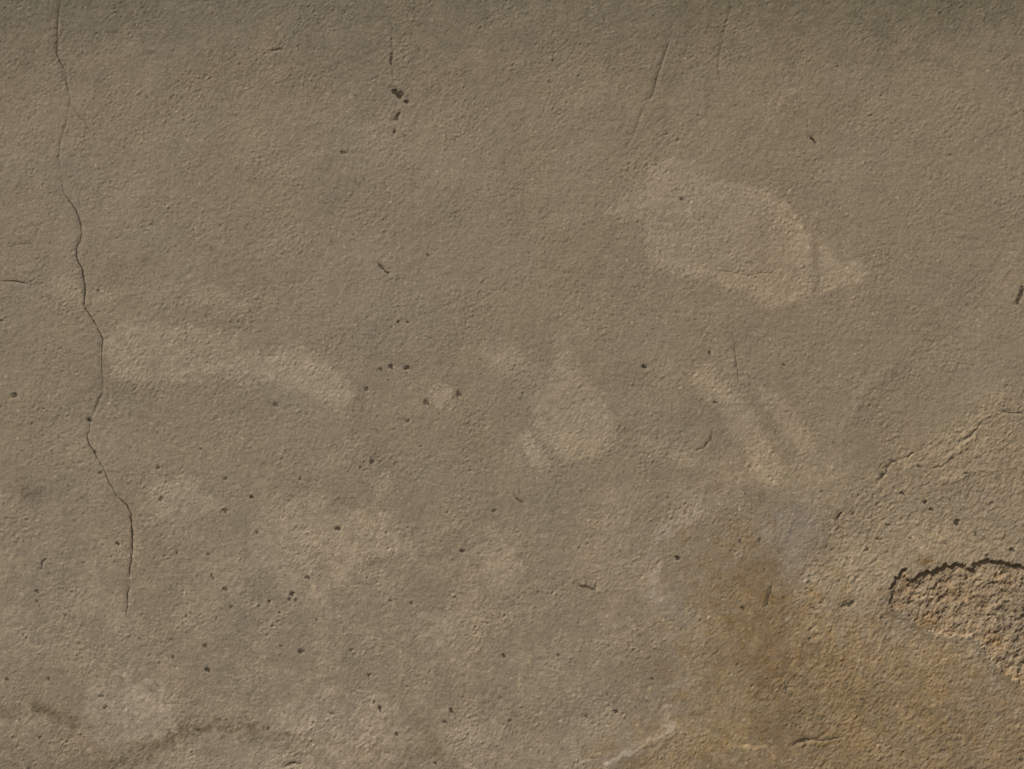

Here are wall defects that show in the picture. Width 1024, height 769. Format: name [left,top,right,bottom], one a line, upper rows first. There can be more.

crack [55,0,134,613]
peeling [676,351,1024,689]